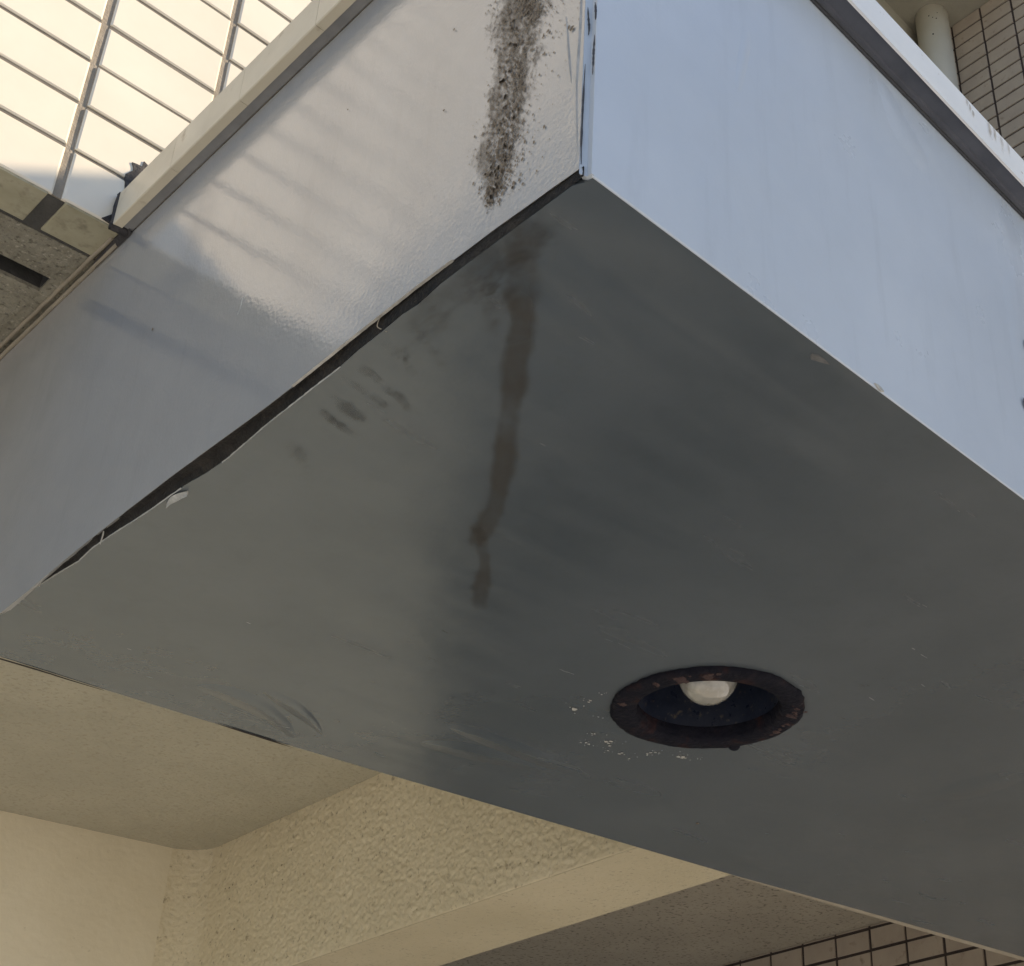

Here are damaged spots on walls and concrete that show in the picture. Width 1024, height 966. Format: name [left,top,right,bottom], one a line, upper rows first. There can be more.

mould [467,0,579,214]